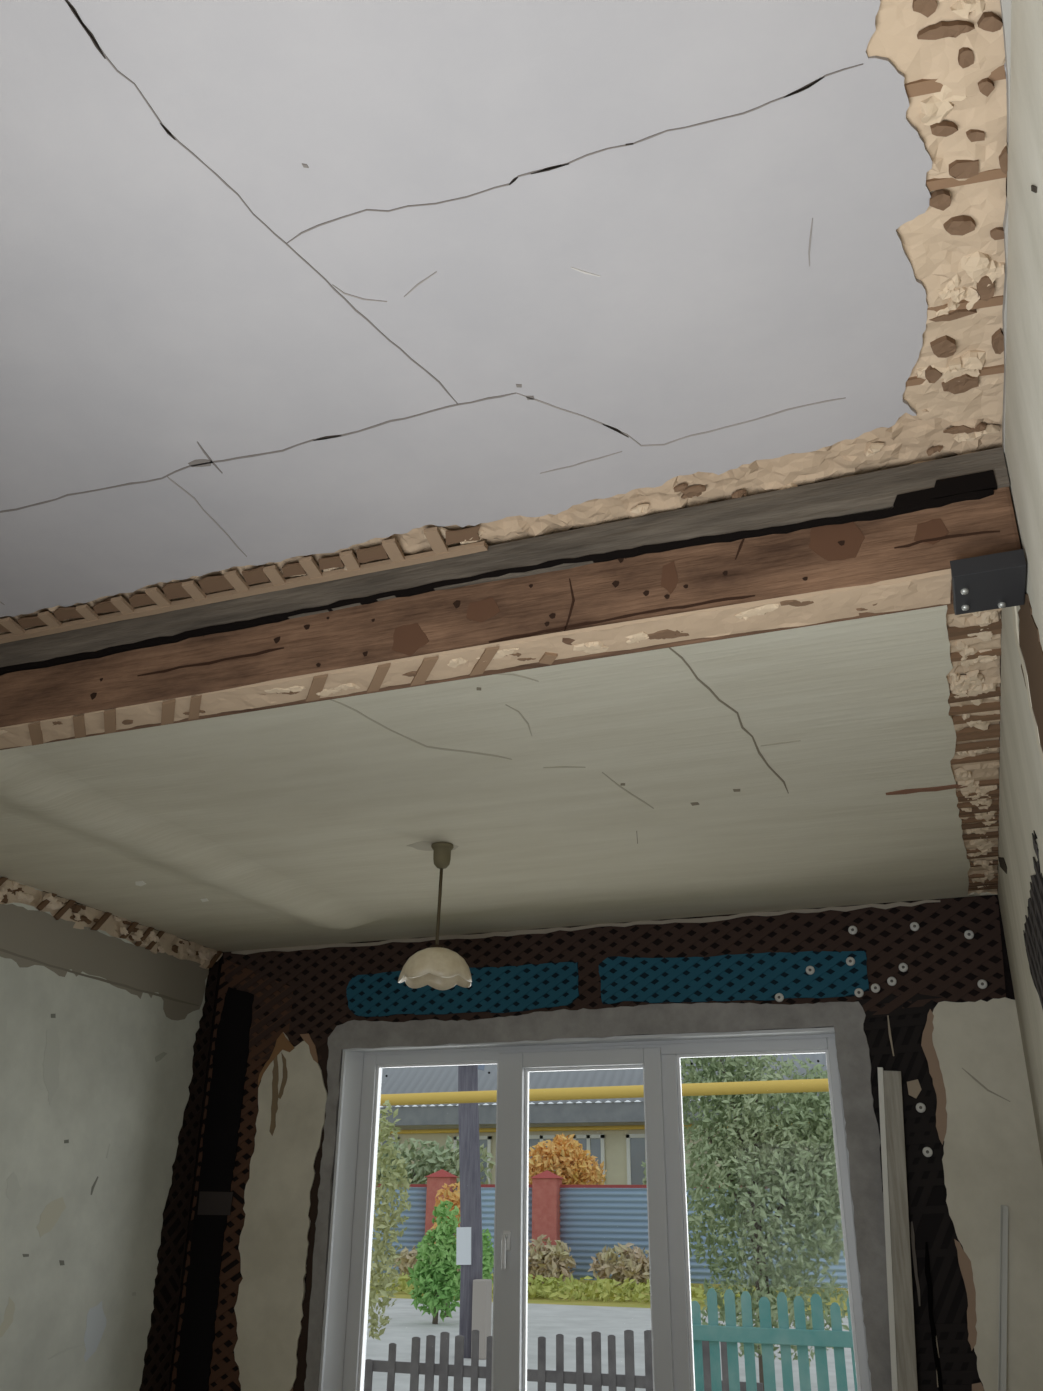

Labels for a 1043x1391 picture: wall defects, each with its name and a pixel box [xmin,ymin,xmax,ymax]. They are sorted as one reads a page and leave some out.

crack [0,0,863,557]
flaking render [0,0,1008,644]
crack [489,578,755,643]
crack [331,699,654,844]
crack [669,648,801,793]
flaking render [946,604,1007,894]
peeling [0,877,223,1021]
flaking render [346,962,579,1017]
flaking render [599,951,869,1004]
spalling [921,1009,947,1145]
flaking render [258,1032,329,1391]
spalling [954,1239,977,1351]